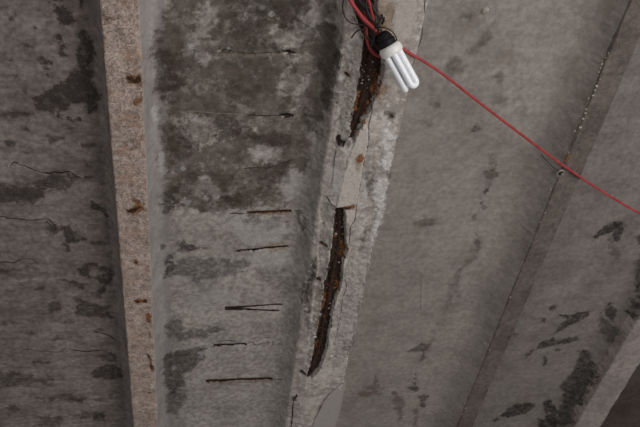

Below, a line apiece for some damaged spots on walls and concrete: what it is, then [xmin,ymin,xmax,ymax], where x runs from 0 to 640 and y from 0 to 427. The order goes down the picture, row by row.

water stain [48,0,77,26]
water stain [4,30,102,122]
water stain [153,0,343,213]
crack [0,216,58,234]
crack [10,162,80,190]
rust [126,198,145,215]
spalling [300,0,386,377]
water stain [592,221,626,242]
water stain [63,262,114,318]
water stain [526,306,588,359]
water stain [163,347,205,392]
water stain [494,350,596,427]